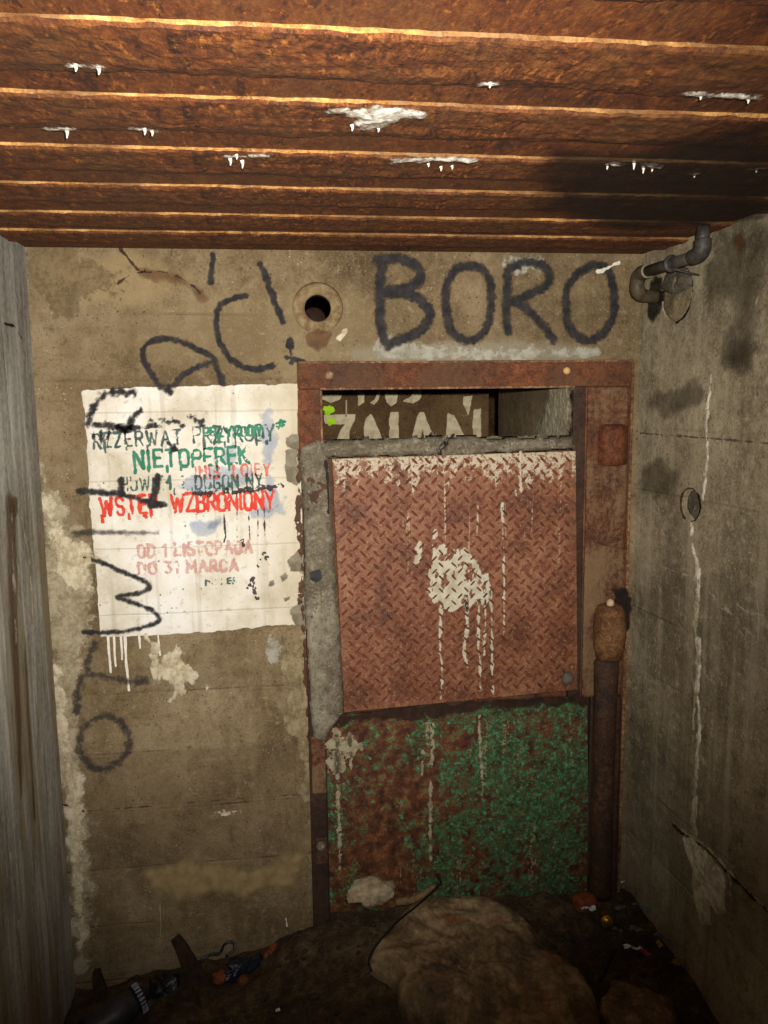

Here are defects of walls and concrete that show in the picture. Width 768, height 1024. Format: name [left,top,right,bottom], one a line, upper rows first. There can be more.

leakage [67,63,104,75]
leakage [683,92,759,104]
leakage [327,105,426,132]
leakage [224,154,270,169]
leakage [390,156,479,171]
leakage [701,374,712,500]
peeling [144,633,209,703]
leakage [683,522,727,927]